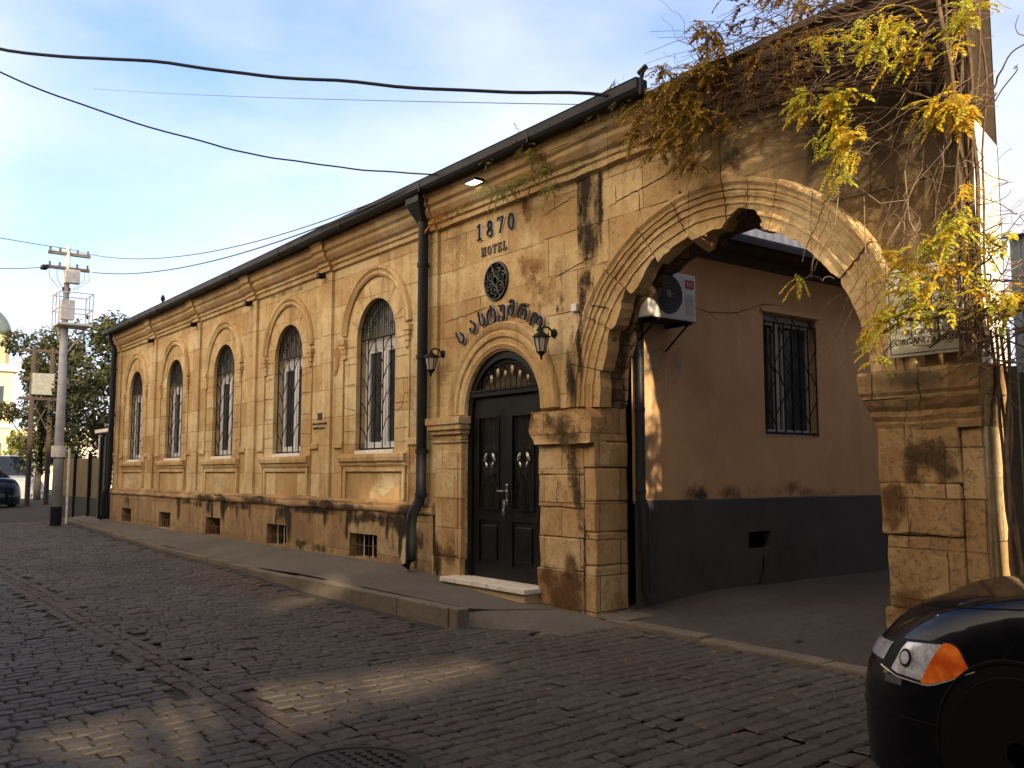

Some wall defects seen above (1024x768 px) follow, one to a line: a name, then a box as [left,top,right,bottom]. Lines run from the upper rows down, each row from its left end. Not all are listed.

damp [565,172,603,404]
damp [567,444,583,530]
damp [903,436,958,483]
damp [177,494,454,576]
damp [539,555,582,612]